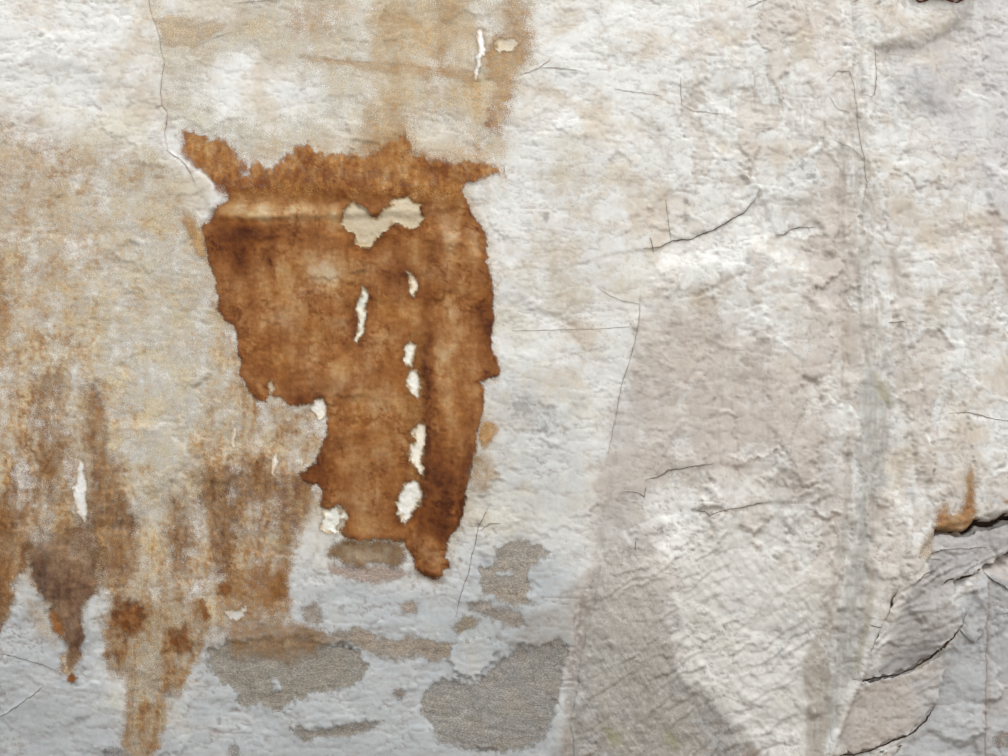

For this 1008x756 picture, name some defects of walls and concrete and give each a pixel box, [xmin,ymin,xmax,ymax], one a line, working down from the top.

rust [0,0,536,756]
rust [922,469,977,556]
spalling [206,539,569,754]
crack [842,706,935,756]
crack [860,626,961,682]
crack [919,513,1008,756]